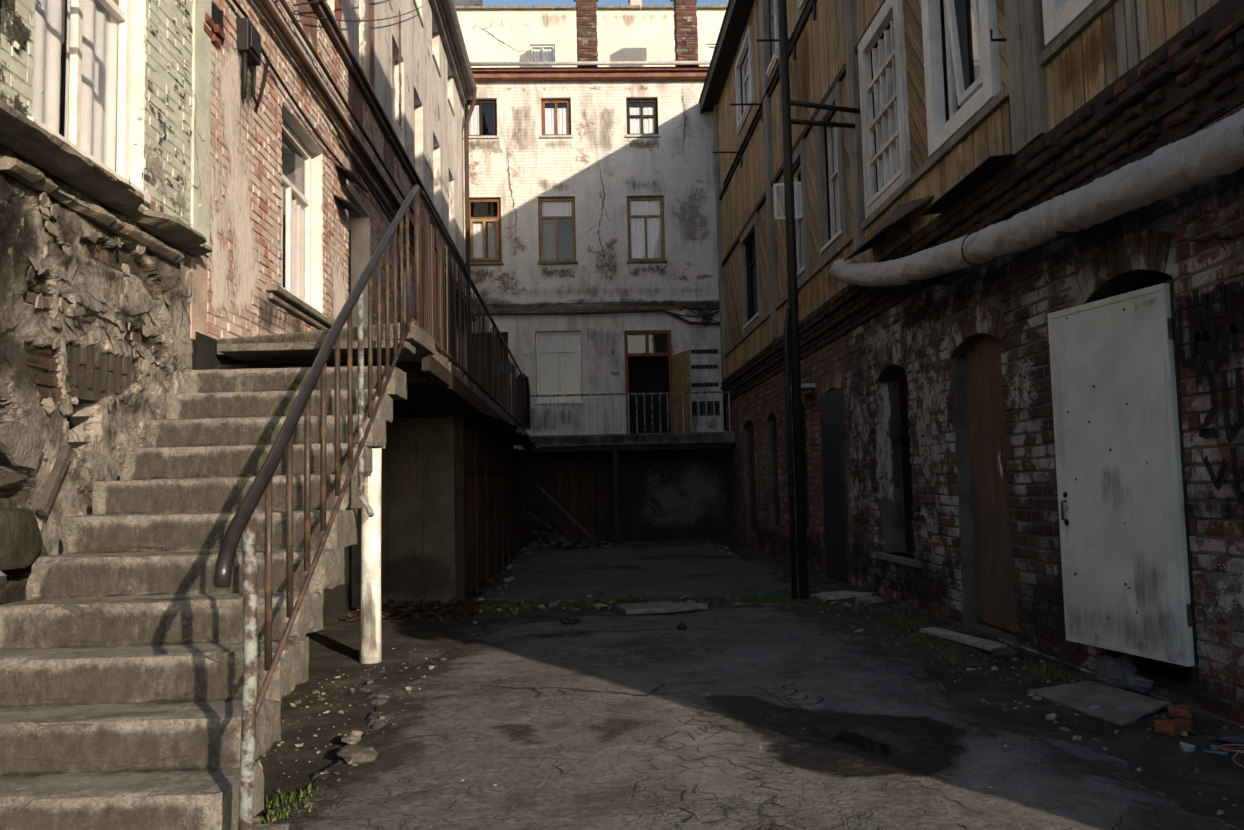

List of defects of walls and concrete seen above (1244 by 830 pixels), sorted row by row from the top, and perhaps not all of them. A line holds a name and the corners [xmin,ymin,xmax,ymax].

peeling [0,0,32,114]
spalling [204,2,225,50]
peeling [133,101,202,223]
crack [674,88,693,156]
spalling [22,192,178,415]
crack [588,161,610,281]
peeling [586,238,668,278]
spalling [600,299,720,332]
rust [361,595,375,648]
crack [483,680,891,830]
leakage [706,695,1244,830]